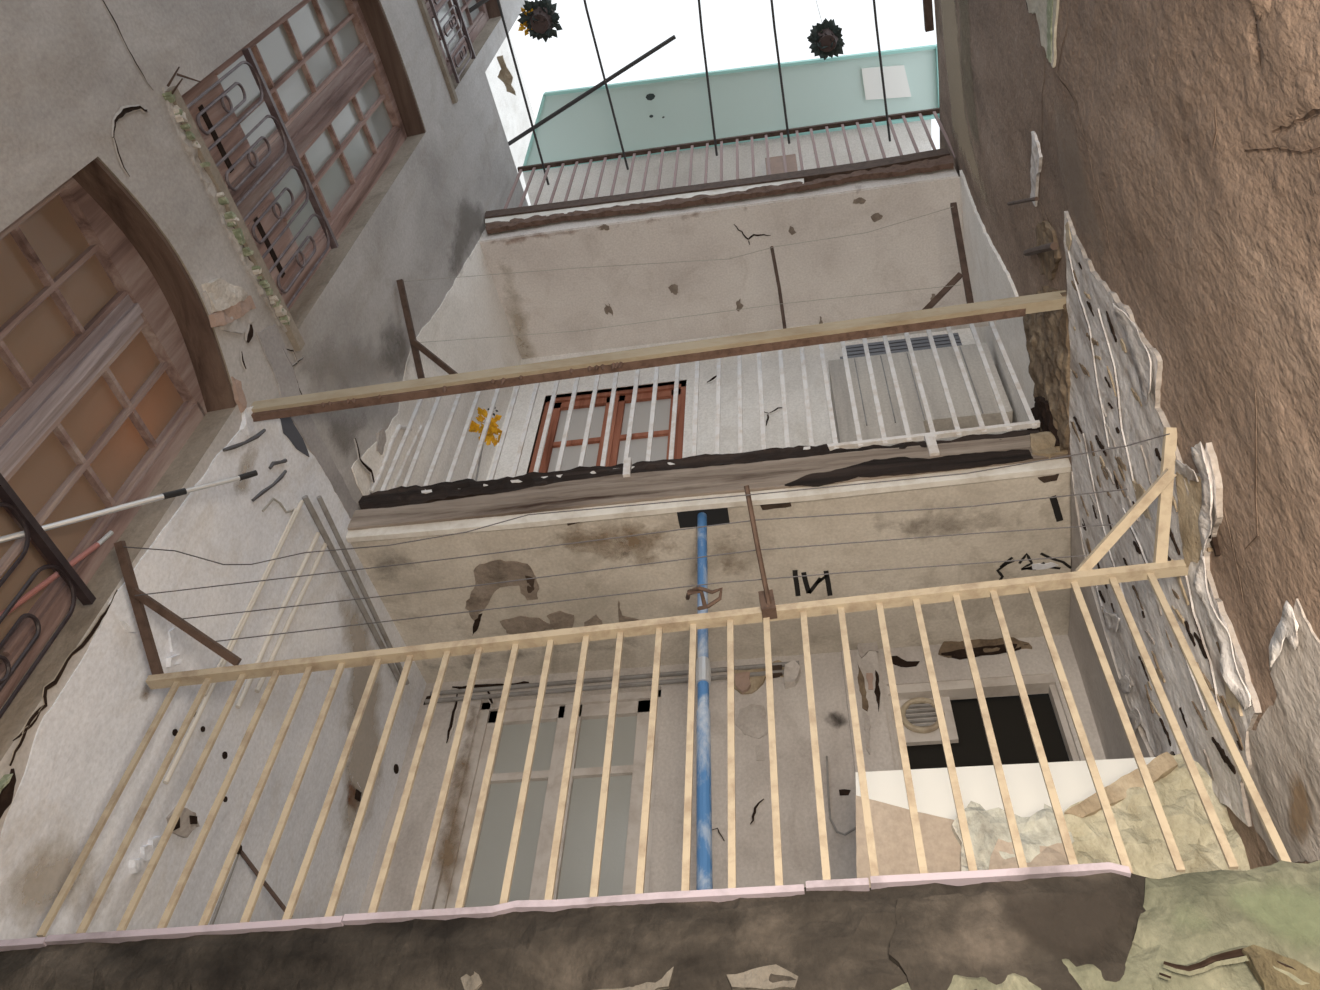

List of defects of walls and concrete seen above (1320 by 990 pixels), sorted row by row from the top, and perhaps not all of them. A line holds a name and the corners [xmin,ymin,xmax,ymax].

flaking render [1026,0,1059,68]
crack [1253,11,1262,68]
crack [101,0,153,177]
crack [1244,97,1320,173]
crack [734,224,771,245]
peeling [465,560,539,634]
peeling [500,611,602,634]
flaking render [618,601,638,622]
crack [9,589,118,766]
flaking render [597,967,674,990]
flaking render [727,964,798,990]
flaking render [1242,944,1320,990]